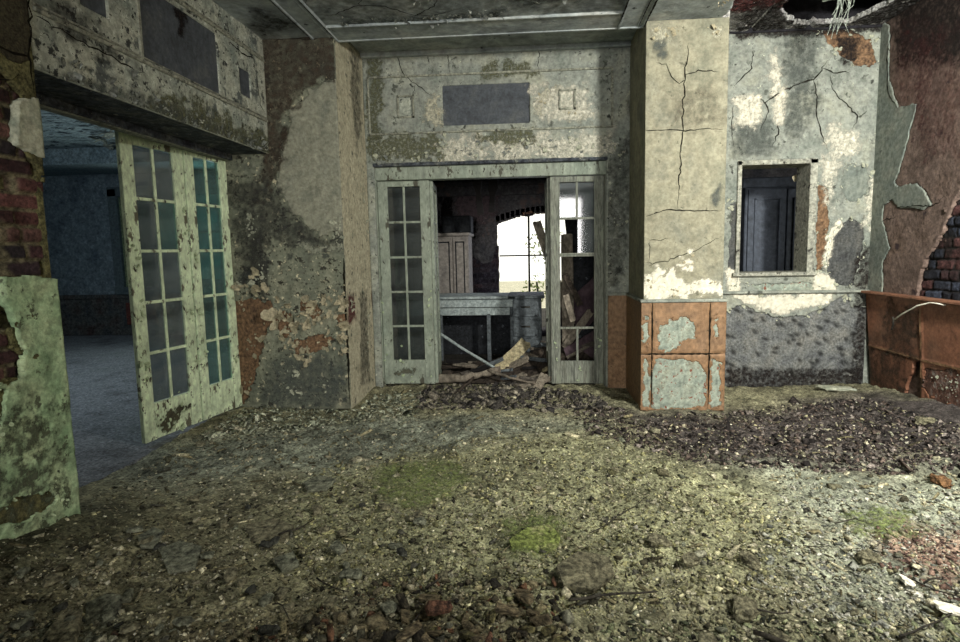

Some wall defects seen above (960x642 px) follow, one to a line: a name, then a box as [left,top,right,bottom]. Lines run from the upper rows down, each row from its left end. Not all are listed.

flaking render [0,73,43,278]
water stain [227,8,343,300]
crack [646,46,867,216]
peeling [816,30,880,67]
crack [886,27,895,103]
flaking render [0,320,39,442]
peeling [224,264,355,404]
crack [649,238,718,265]
flaking render [640,163,875,411]
flaking render [919,200,960,301]